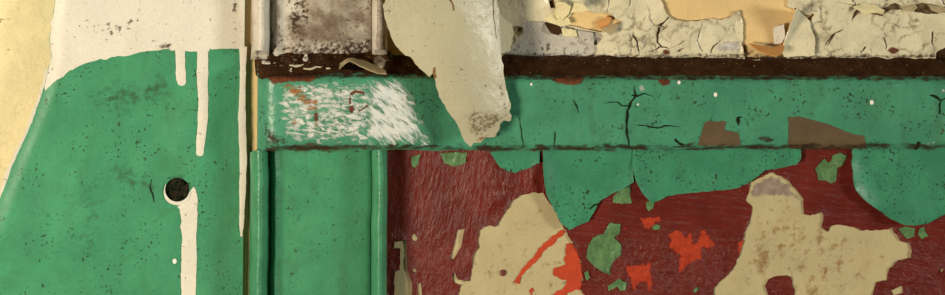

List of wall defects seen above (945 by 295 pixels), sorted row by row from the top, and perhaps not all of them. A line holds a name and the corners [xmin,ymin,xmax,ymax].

crack [632,17,721,51]
peeling [661,0,815,58]
peeling [0,0,247,295]
crack [604,86,684,146]
peeling [698,121,741,146]
peeling [788,116,866,149]
peeling [394,233,422,295]
peeling [450,229,465,260]
peeling [453,192,584,295]
peeling [626,262,653,294]
peeling [640,217,661,229]
peeling [713,172,912,295]